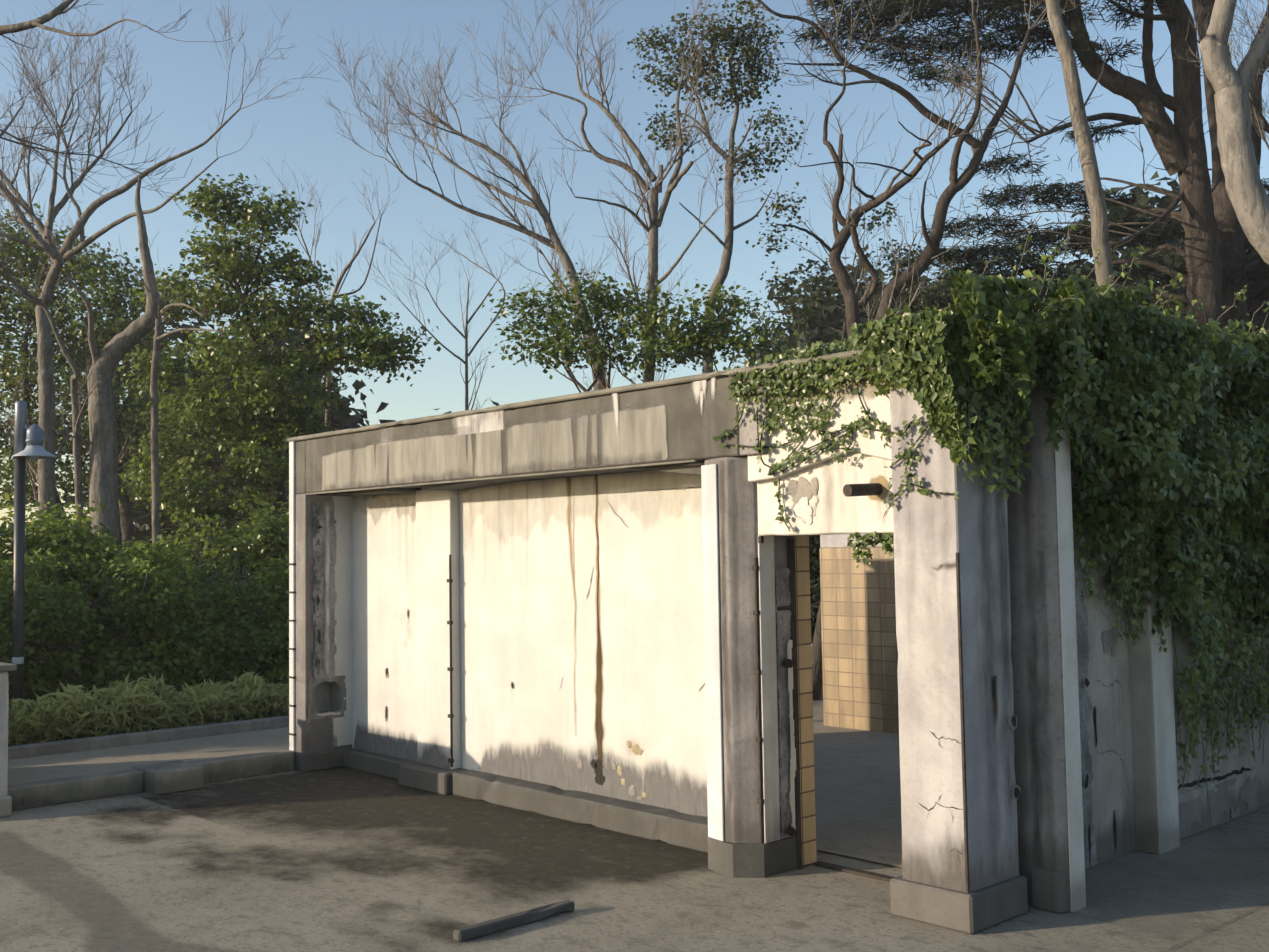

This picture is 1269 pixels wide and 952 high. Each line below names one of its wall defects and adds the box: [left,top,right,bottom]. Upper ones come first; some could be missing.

peeling [308,405,668,752]
corrosion [577,475,605,785]
leakage [354,725,450,769]
leakage [96,766,708,897]
leakage [479,744,708,817]
spalling [775,568,796,839]
crack [1178,766,1257,838]